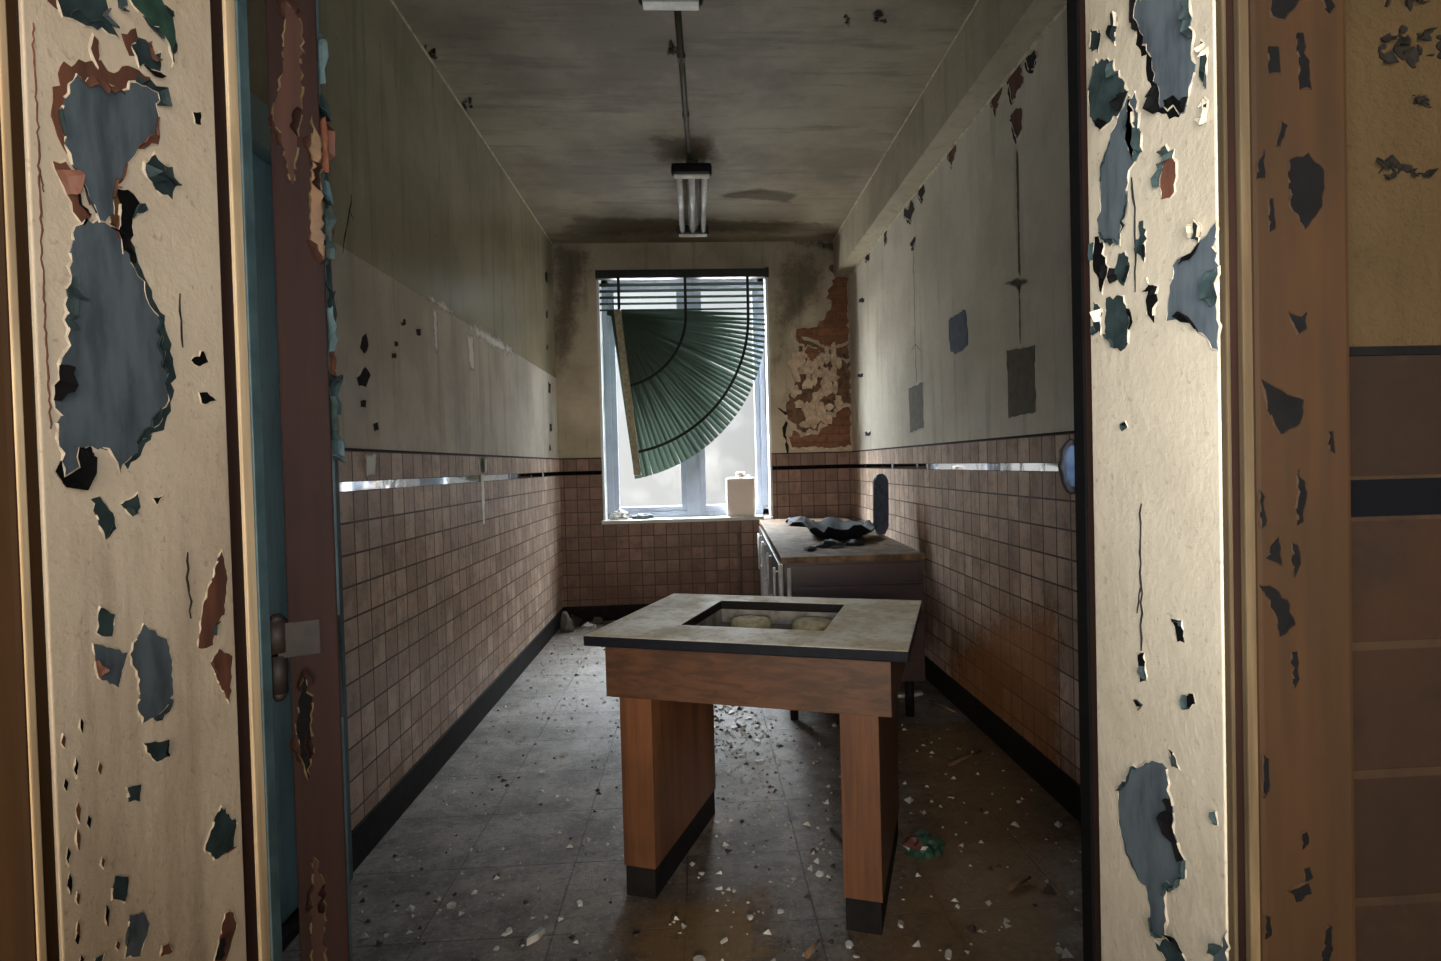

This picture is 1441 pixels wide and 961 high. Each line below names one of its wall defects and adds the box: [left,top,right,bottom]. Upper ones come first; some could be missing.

peeling [47,0,182,540]
peeling [190,350,209,368]
peeling [268,0,379,463]
flaking render [780,257,871,451]
peeling [1088,0,1222,352]
peeling [1256,120,1326,235]
peeling [92,605,174,725]
peeling [196,549,233,705]
peeling [60,718,173,961]
peeling [203,805,237,861]
peeling [213,910,237,961]
peeling [1116,748,1231,961]